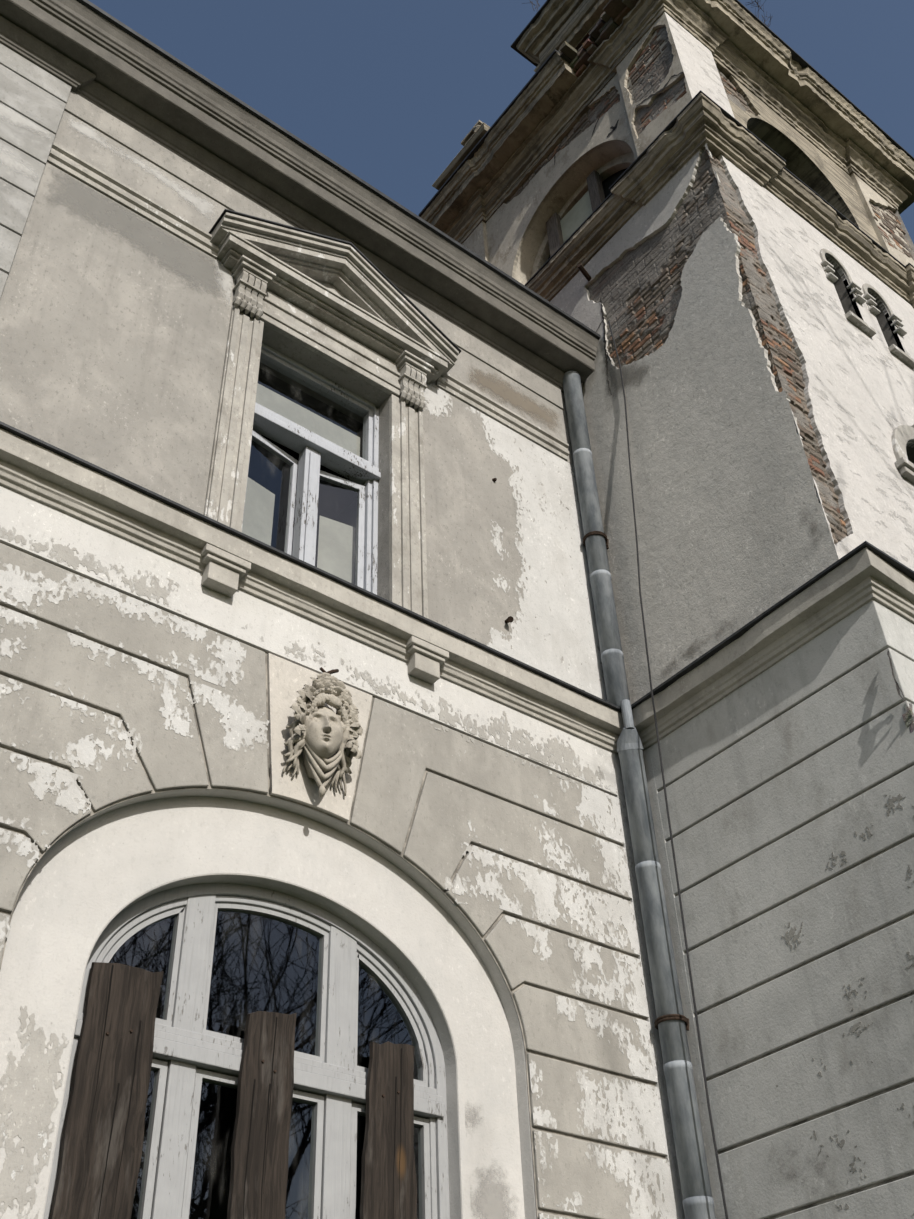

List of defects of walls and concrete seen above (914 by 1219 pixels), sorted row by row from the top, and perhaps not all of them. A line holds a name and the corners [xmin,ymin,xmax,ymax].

flaking render [506,27,687,204]
flaking render [869,202,914,260]
flaking render [587,148,848,544]
peeling [424,384,607,701]
peeling [0,681,143,814]
peeling [0,525,271,752]
peeling [284,640,326,667]
crack [887,651,914,719]
peeling [0,816,50,876]
peeling [341,658,684,1219]
peeling [0,1005,69,1219]